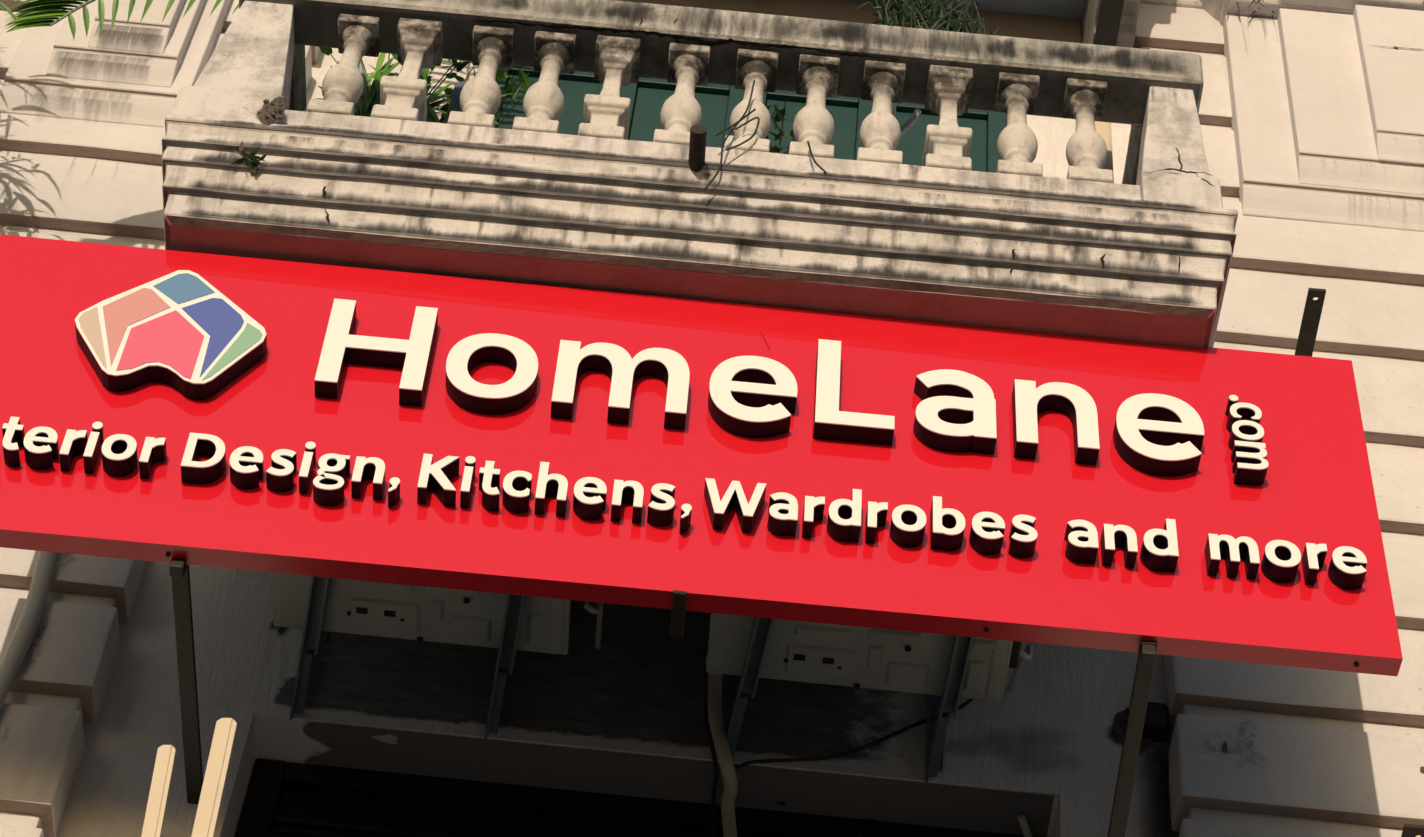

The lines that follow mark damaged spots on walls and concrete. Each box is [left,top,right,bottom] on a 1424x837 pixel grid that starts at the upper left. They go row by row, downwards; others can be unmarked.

crack [1147,148,1214,186]